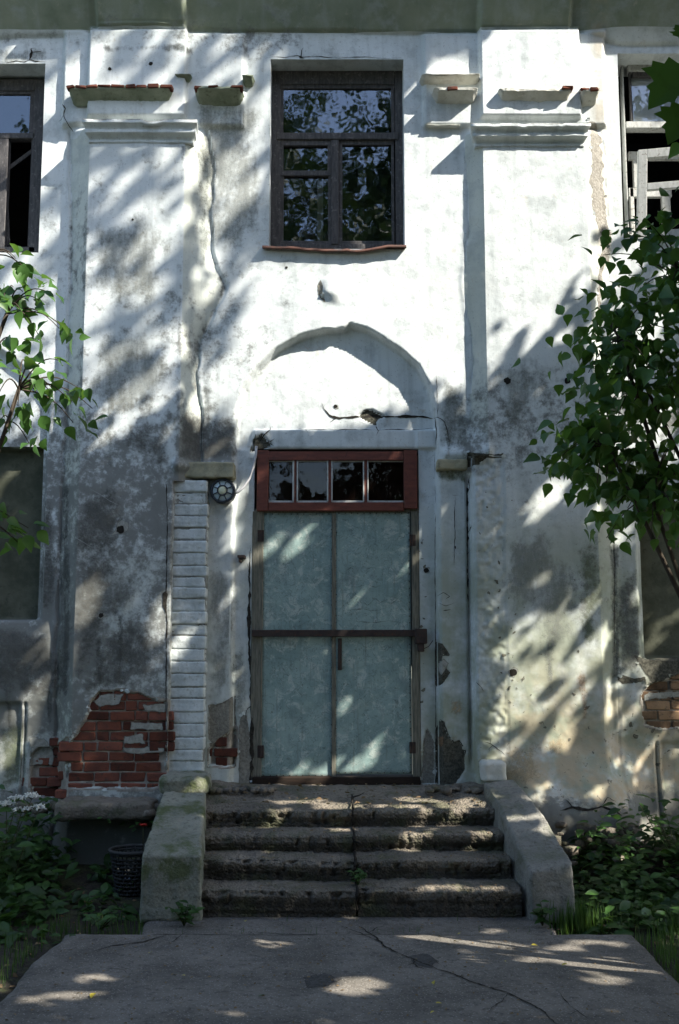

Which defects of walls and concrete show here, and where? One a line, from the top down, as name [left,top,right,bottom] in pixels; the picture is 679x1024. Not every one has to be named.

spalling [587,118,612,309]
damp [129,431,164,463]
crack [303,375,450,446]
damp [0,490,151,693]
flaking render [22,688,175,800]
spalling [207,696,252,783]
spalling [420,720,466,785]
flaking render [615,655,679,746]
crack [347,793,365,911]